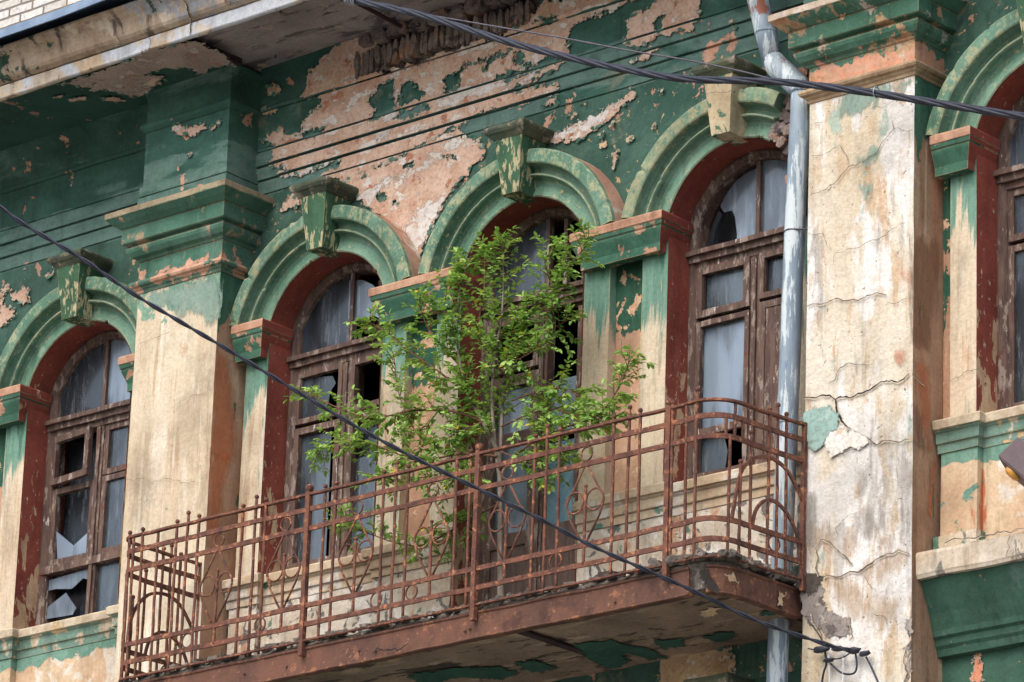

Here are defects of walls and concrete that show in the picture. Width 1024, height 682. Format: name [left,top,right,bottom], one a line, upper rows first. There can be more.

peeling [52,41,237,103]
peeling [258,0,702,256]
peeling [0,284,31,328]
crack [807,292,906,307]
leakage [909,238,939,347]
crack [804,363,926,455]
leakage [914,407,923,442]
crack [815,512,909,589]
spalling [797,564,851,639]
peeling [407,660,558,682]
peeling [571,632,736,682]
peeling [969,653,984,682]